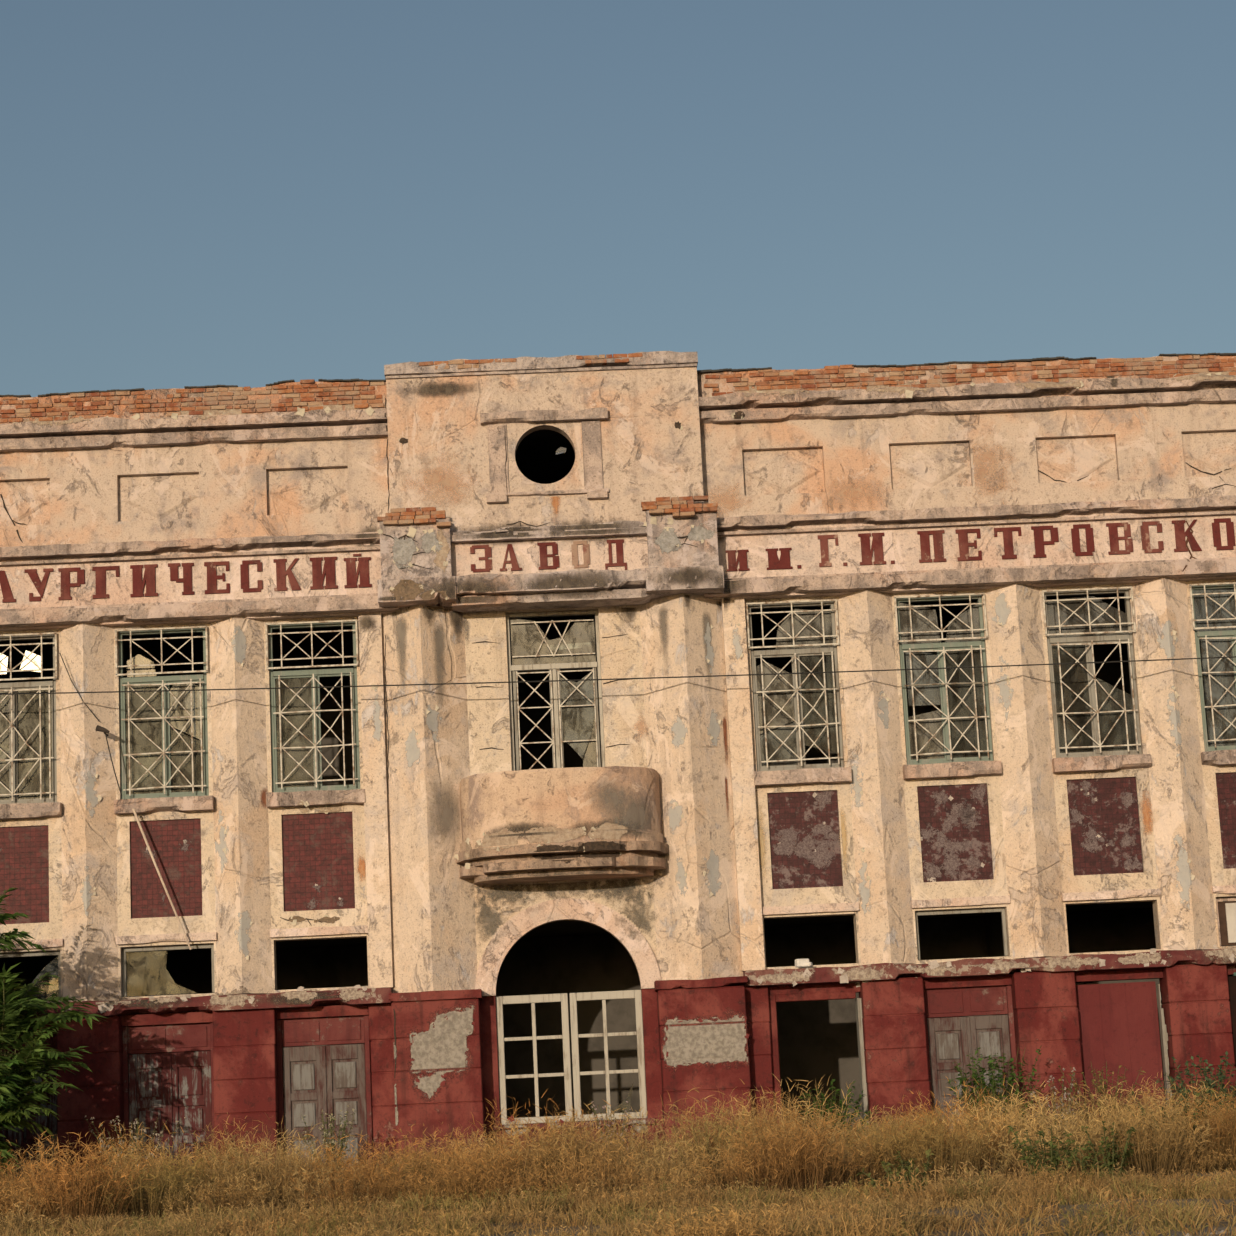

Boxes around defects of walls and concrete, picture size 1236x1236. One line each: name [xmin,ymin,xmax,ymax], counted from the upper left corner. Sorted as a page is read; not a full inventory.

crack [0,494,26,543]
peeling [772,791,843,869]
peeling [920,784,989,882]
damp [474,872,651,938]
peeling [94,991,191,1013]
peeling [278,986,320,1002]
peeling [337,985,373,1002]
peeling [757,968,812,987]
peeling [837,966,883,987]
peeling [906,948,1166,978]
peeling [394,1002,476,1102]
peeling [657,1008,750,1074]